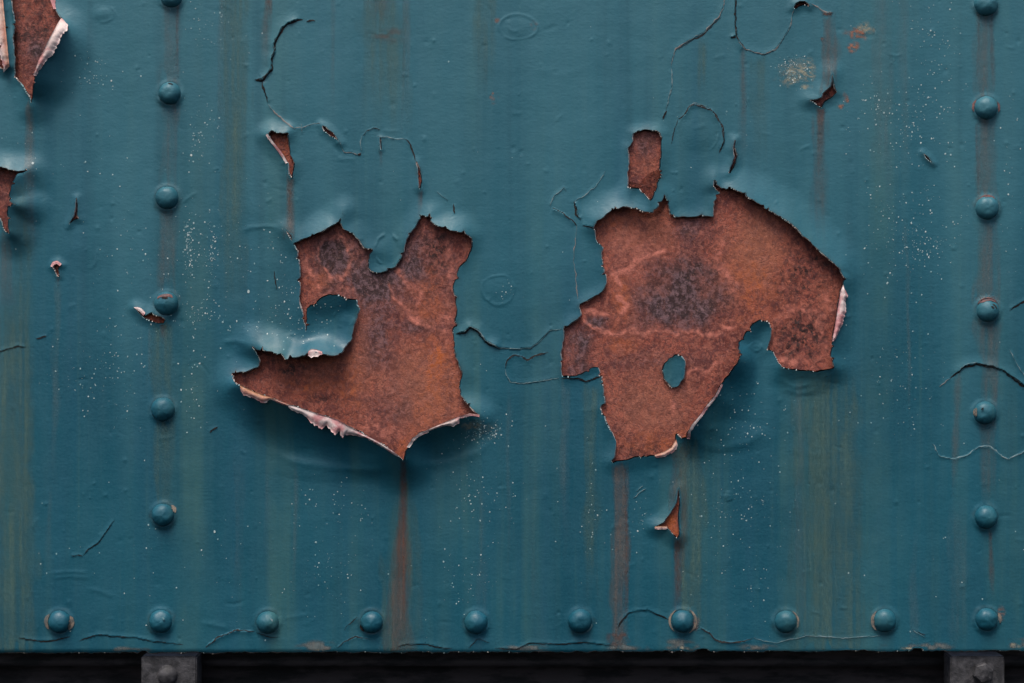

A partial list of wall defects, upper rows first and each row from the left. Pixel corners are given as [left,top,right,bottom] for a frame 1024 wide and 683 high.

peeling [0,0,99,131]
crack [255,19,318,130]
crack [663,0,833,153]
peeling [794,57,846,116]
peeling [0,150,87,262]
peeling [253,117,305,187]
crack [340,128,415,159]
peeling [207,156,501,497]
peeling [554,119,866,477]
crack [939,351,1024,387]
peeling [641,481,692,551]